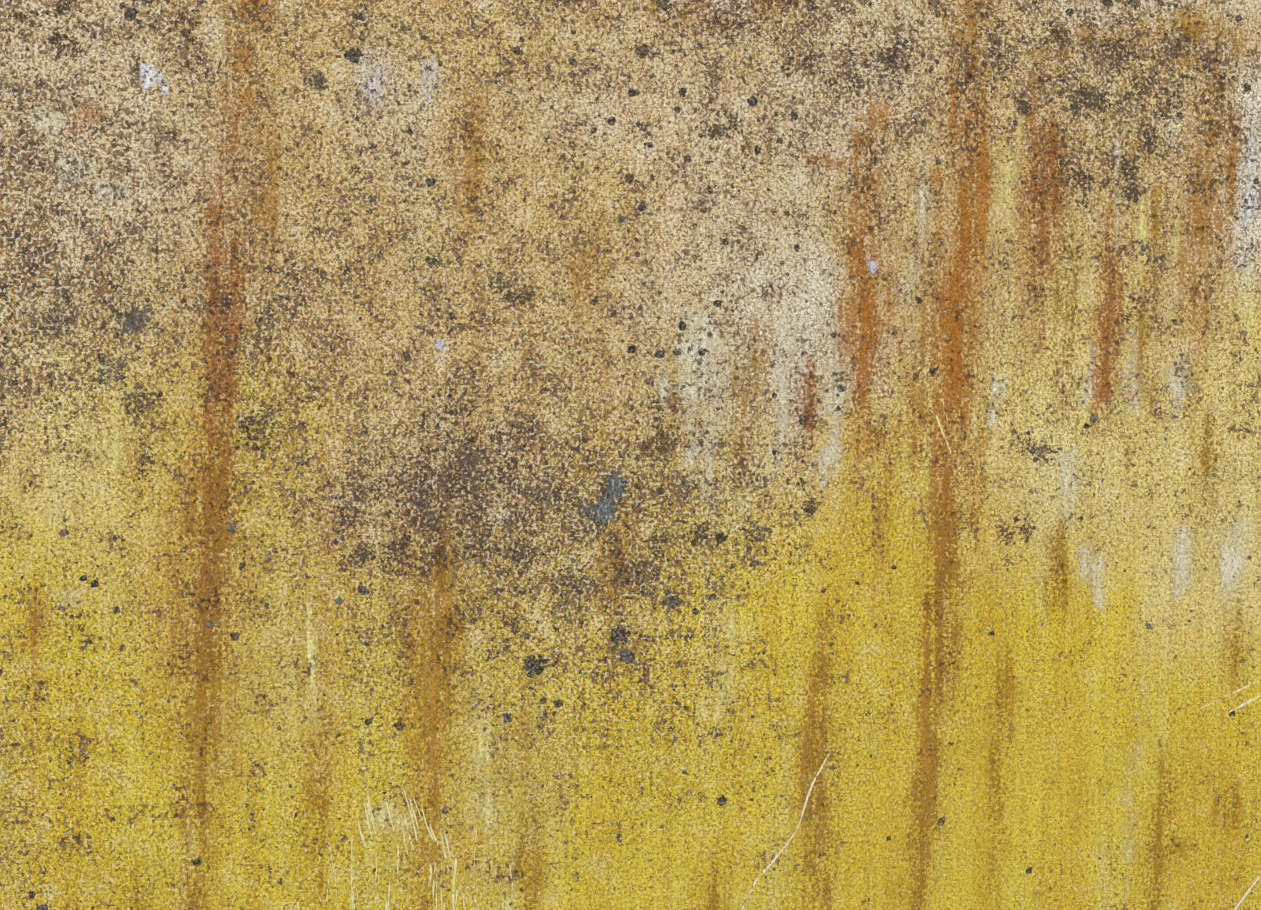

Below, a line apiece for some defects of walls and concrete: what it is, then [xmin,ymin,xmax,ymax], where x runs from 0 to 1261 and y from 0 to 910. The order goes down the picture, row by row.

mould [11,0,88,61]
mould [698,0,816,45]
corrosion [1137,10,1260,71]
corrosion [1025,105,1076,364]
corrosion [1179,80,1237,335]
corrosion [1091,253,1123,430]
corrosion [171,179,253,859]
mould [307,392,627,598]
mould [482,604,530,639]
mould [610,519,722,594]
mould [739,516,772,544]
corrosion [808,88,989,910]